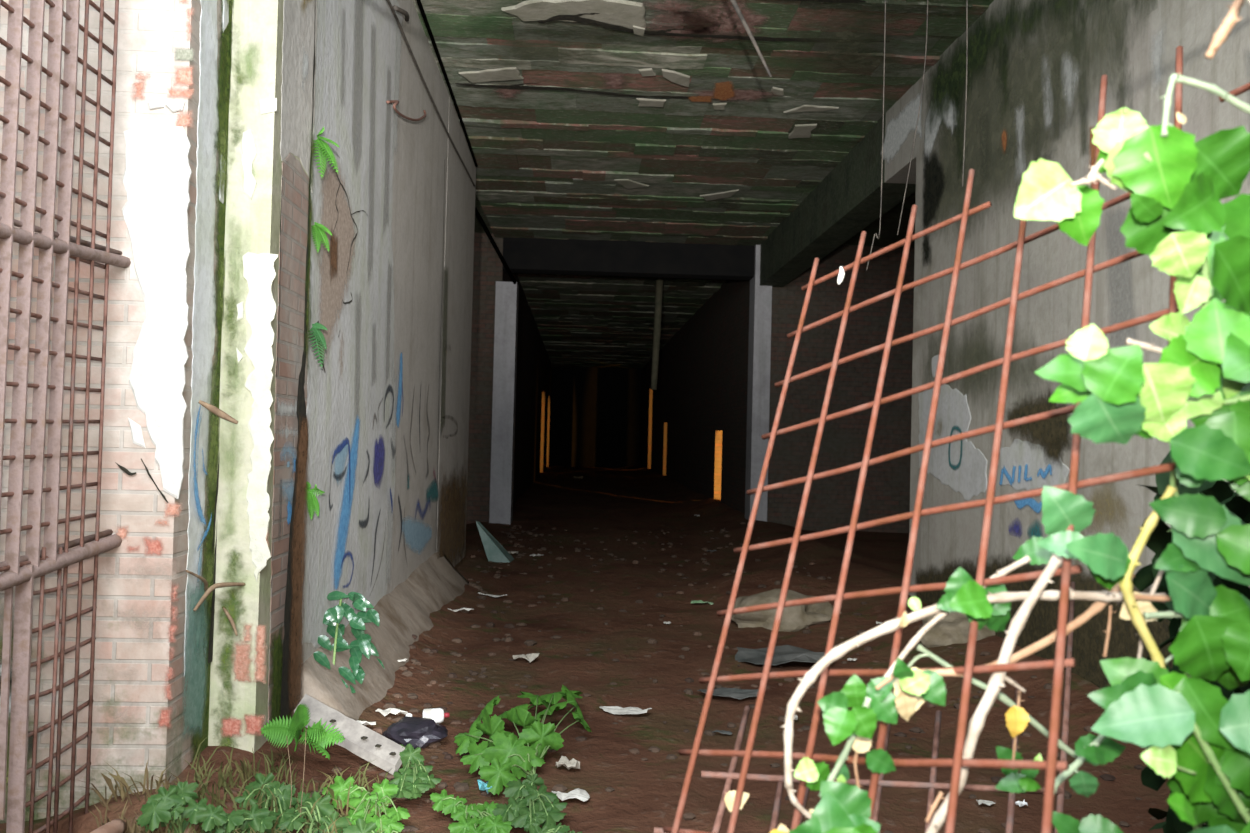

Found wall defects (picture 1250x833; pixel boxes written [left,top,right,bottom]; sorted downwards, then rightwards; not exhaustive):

water stain [223,25,233,101]
peeling [501,0,767,43]
spalling [636,68,784,110]
spalling [1174,46,1183,130]
water stain [217,132,227,192]
water stain [881,0,1121,263]
water stain [217,258,226,317]
peeling [117,0,229,726]
peeling [222,0,403,741]
water stain [928,338,1036,394]
water stain [206,373,220,488]
spalling [654,169,1180,833]